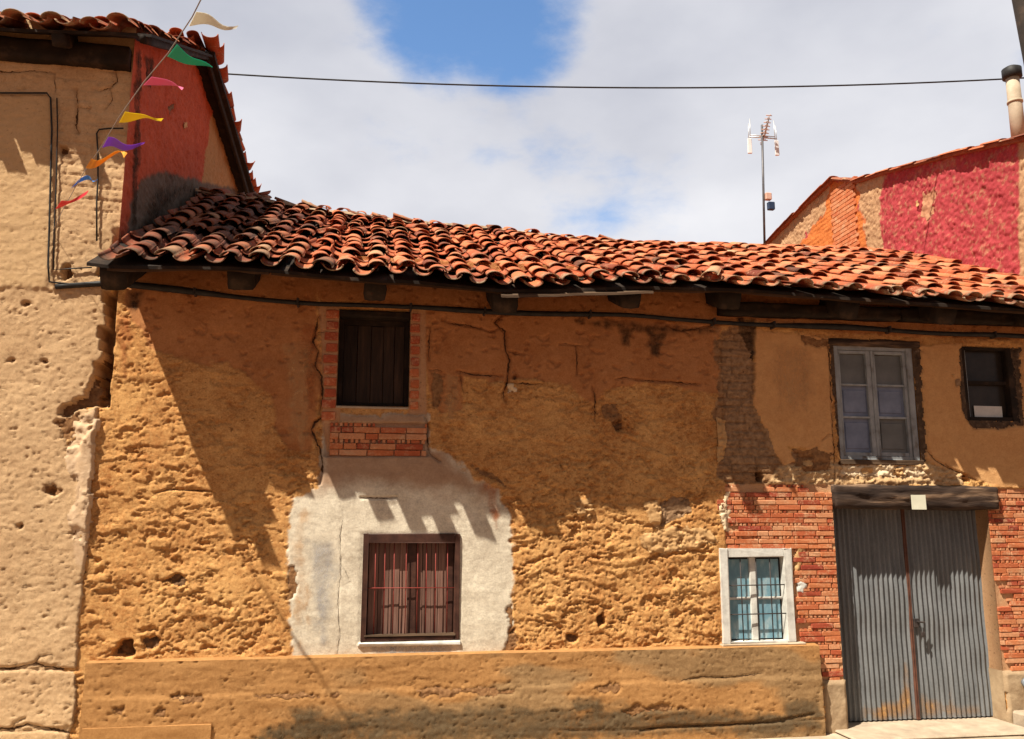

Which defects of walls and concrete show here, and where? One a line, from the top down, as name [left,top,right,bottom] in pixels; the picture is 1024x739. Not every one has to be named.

crack [0,70,118,131]
flaking render [916,190,936,221]
flaking render [55,360,114,446]
crack [311,317,324,473]
crack [428,319,534,396]
flaking render [716,334,779,472]
flaking render [792,335,927,478]
peeling [569,497,594,519]
peeling [639,486,732,556]
flaking render [505,605,518,650]